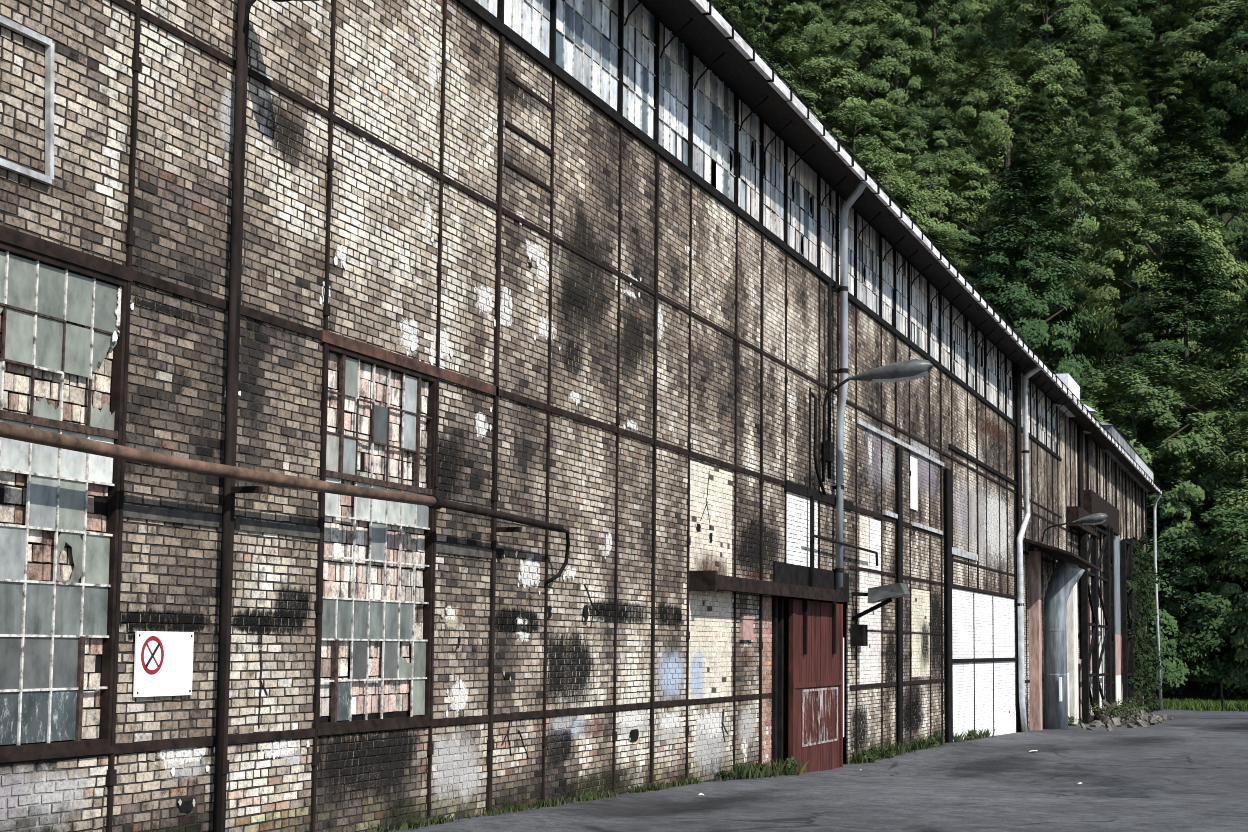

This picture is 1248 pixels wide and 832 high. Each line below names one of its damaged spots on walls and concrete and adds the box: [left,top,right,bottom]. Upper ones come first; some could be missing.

damp [259,100,308,167]
damp [554,204,603,376]
damp [620,314,647,372]
corrosion [326,354,432,495]
corrosion [331,639,339,722]